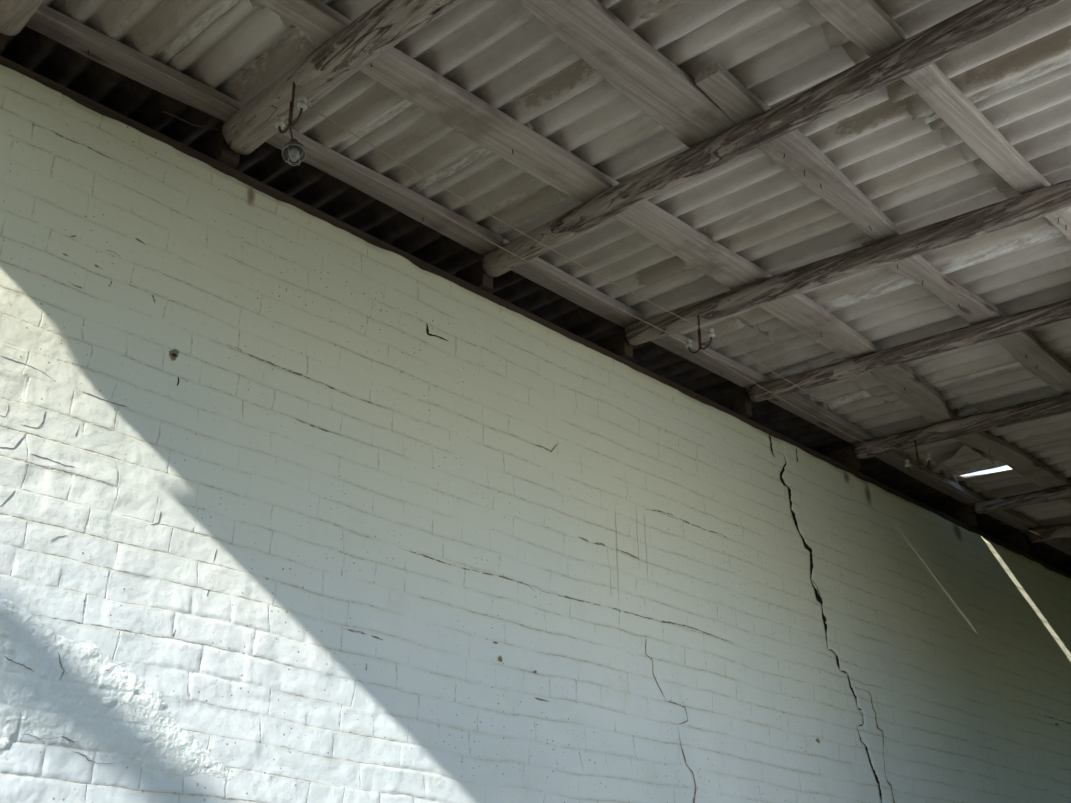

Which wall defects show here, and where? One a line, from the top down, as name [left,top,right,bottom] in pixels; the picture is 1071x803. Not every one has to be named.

crack [399,547,732,642]
crack [769,434,895,803]
crack [645,645,696,803]